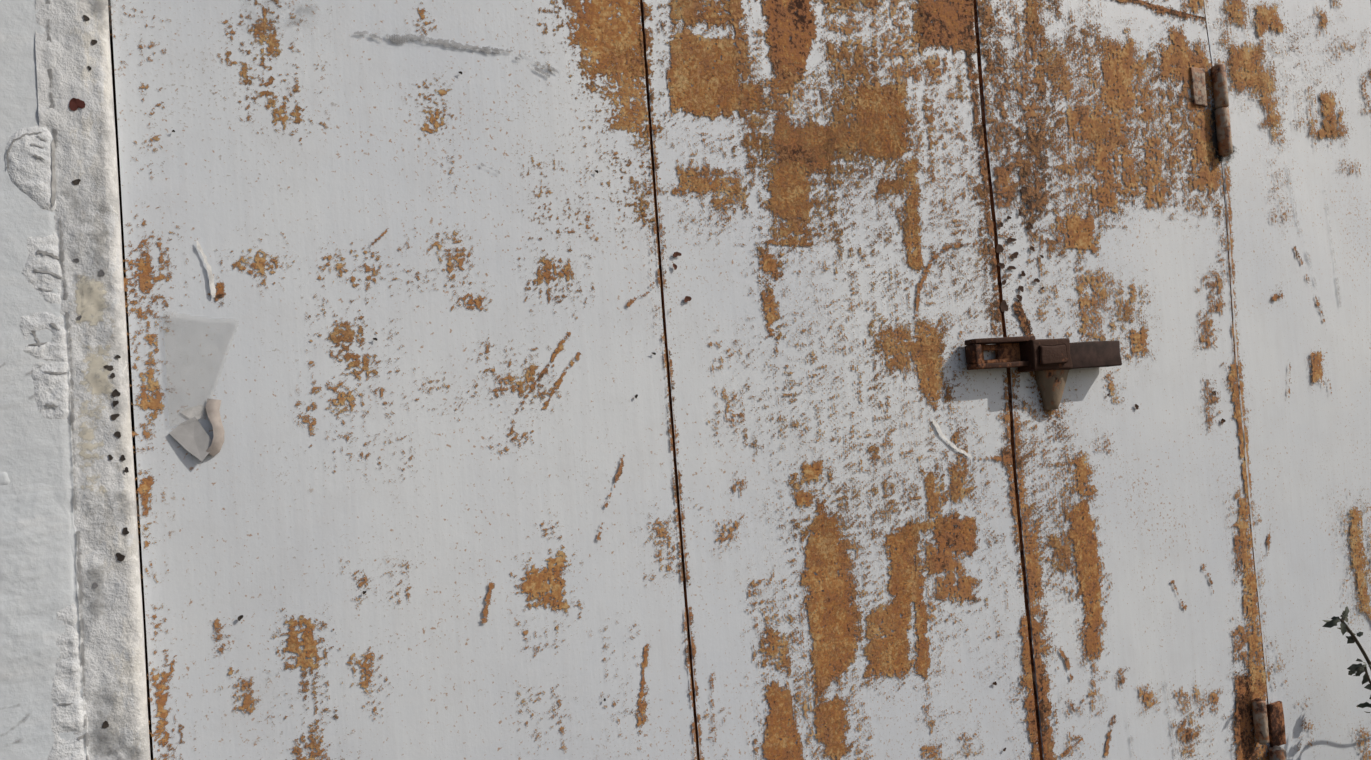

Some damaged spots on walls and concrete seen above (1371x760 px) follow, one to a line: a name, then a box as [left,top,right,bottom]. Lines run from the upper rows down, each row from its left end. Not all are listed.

rust [214,0,329,144]
rust [207,232,300,307]
spalling [19,231,129,492]
rust [123,214,200,586]
rust [293,0,1371,760]
rust [144,603,196,760]
rust [208,608,393,760]